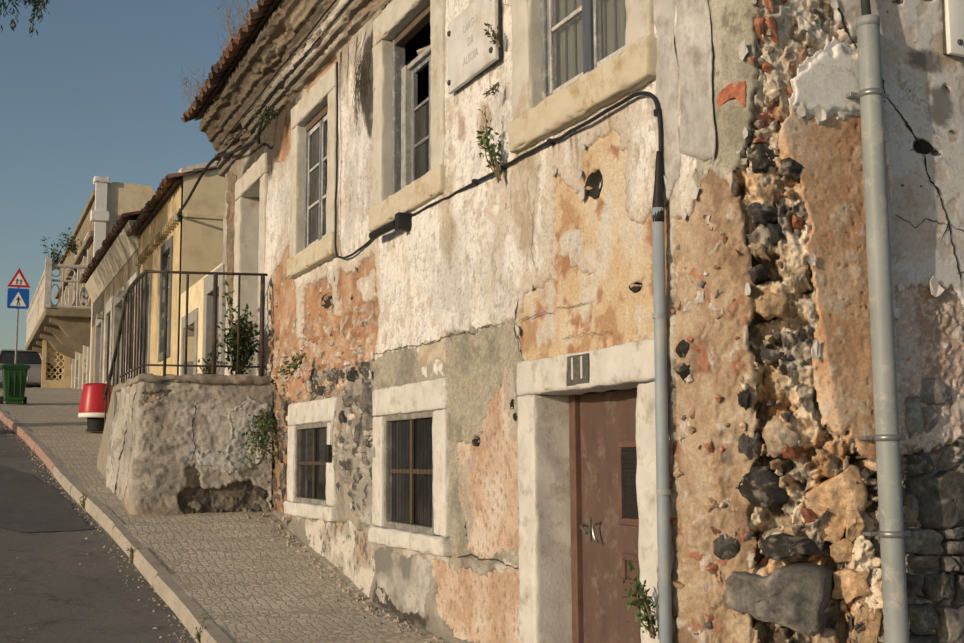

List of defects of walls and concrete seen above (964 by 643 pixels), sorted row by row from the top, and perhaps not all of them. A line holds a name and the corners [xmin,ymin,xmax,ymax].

crack [186,403,198,468]
spalling [178,248,380,597]
damp [340,27,373,137]
spalling [457,365,519,559]
spalling [515,129,654,360]
spalling [664,0,885,643]
crack [882,78,964,284]
flaking render [893,276,964,643]
spalling [431,558,520,643]